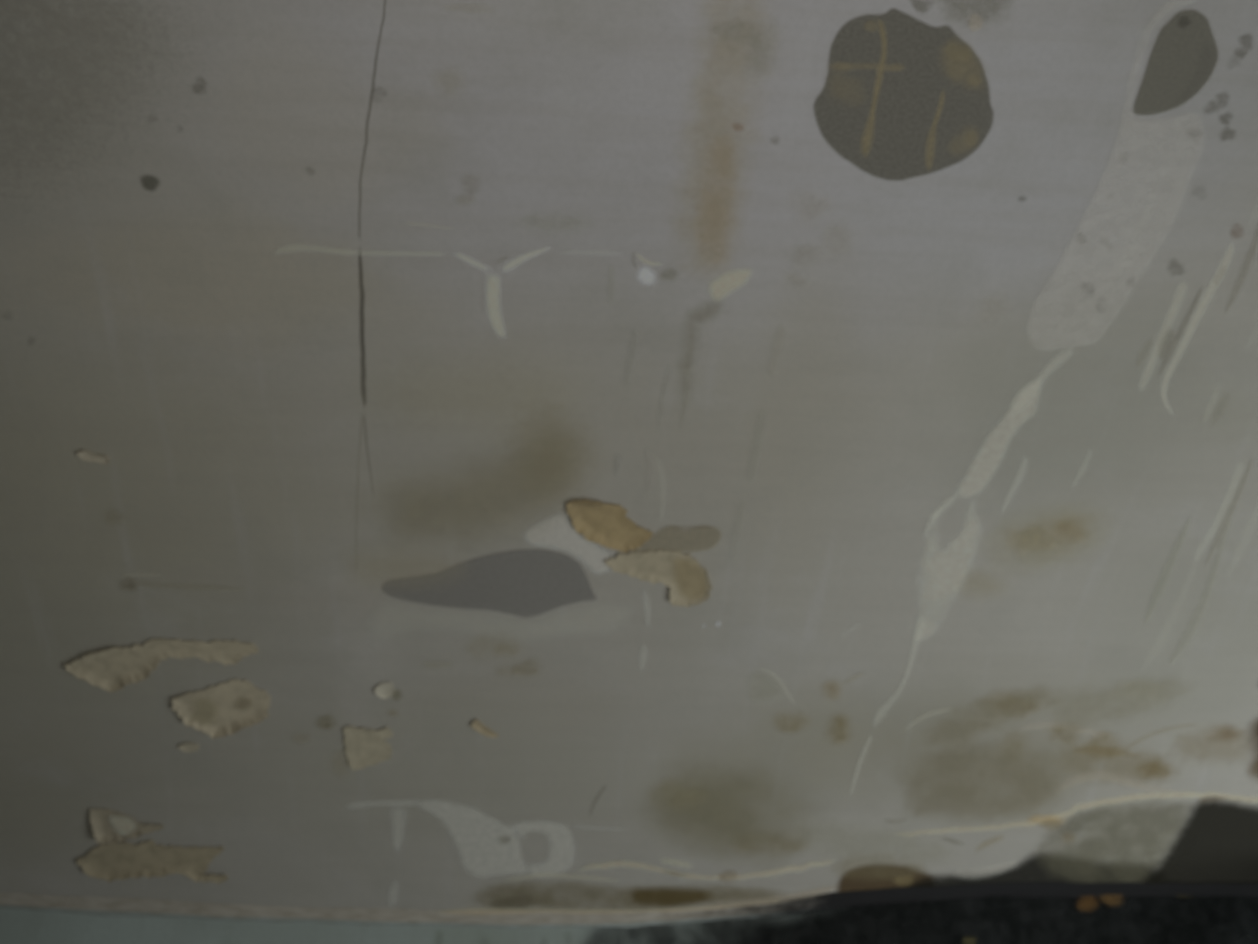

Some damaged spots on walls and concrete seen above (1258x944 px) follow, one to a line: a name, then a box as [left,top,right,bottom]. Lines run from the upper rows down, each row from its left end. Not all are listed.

spalling [815,9,993,180]
spalling [1134,11,1218,115]
crack [358,254,366,402]
spalling [383,499,720,617]
peeling [65,638,271,739]
peeling [89,809,164,844]